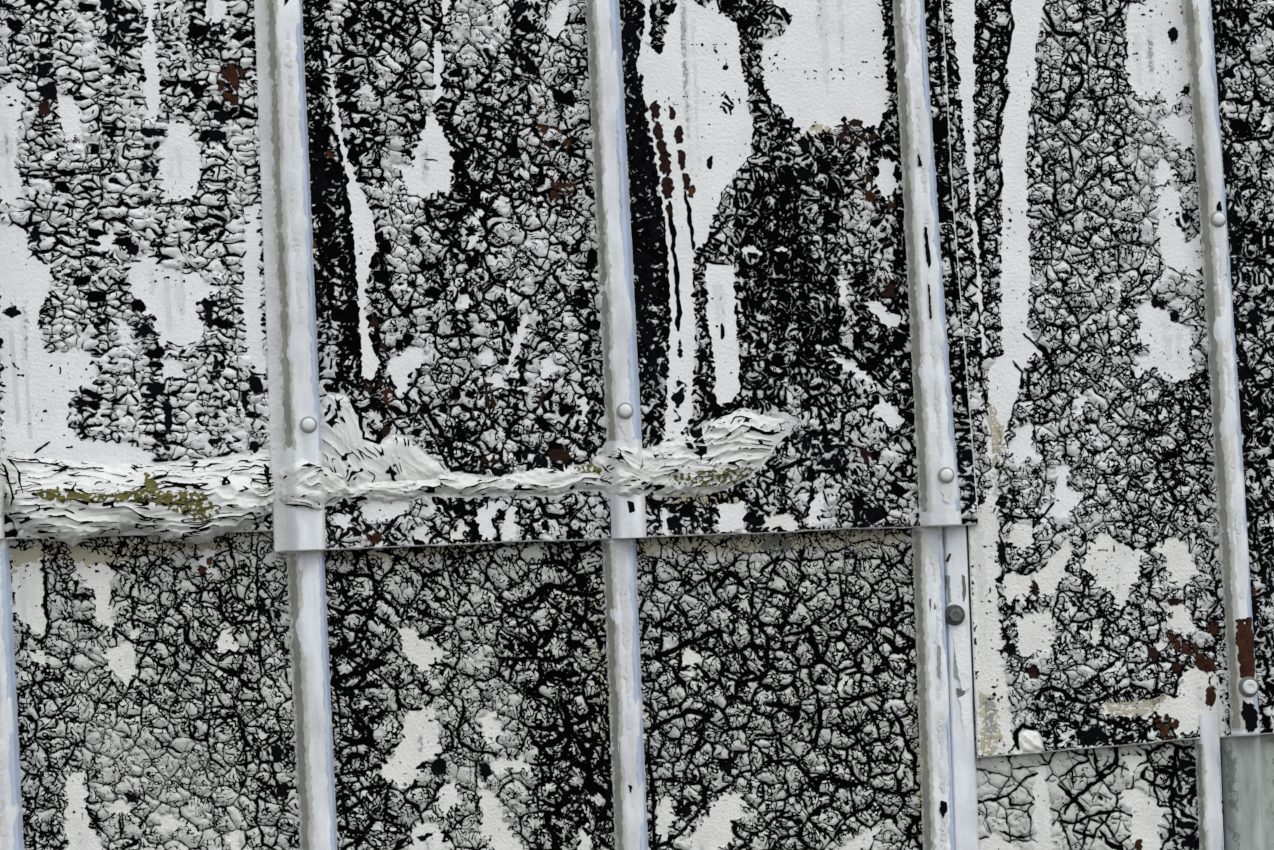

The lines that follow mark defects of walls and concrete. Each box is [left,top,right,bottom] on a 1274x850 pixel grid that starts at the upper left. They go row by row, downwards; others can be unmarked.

peeling [761,0,889,151]
peeling [391,108,454,200]
corrosion [650,101,695,216]
peeling [0,47,231,466]
crack [0,0,923,850]
crack [924,0,1274,850]
peeling [627,469,892,536]
peeling [929,418,1200,755]
corrosion [1148,647,1160,663]
corrosion [1166,632,1216,673]
corrosion [1206,687,1216,706]
corrosion [1235,617,1255,678]